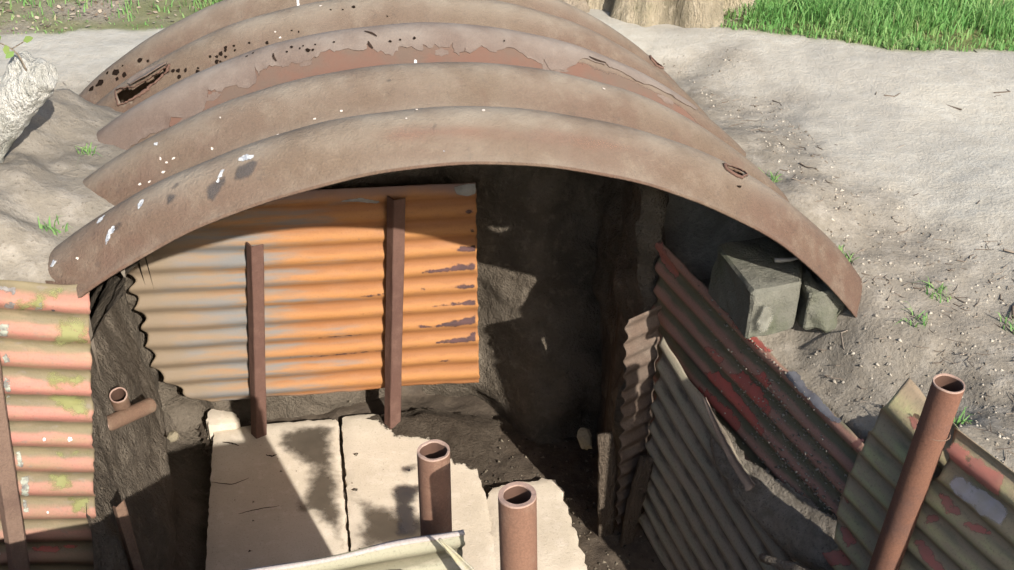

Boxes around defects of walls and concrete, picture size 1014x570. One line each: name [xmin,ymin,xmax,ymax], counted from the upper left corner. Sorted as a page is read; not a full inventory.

rust [97,22,701,150]
spalling [733,306,772,352]
peeling [699,347,771,435]
peeling [786,371,841,423]
leakage [283,427,339,526]
leakage [363,486,421,546]
peeling [924,477,1006,534]